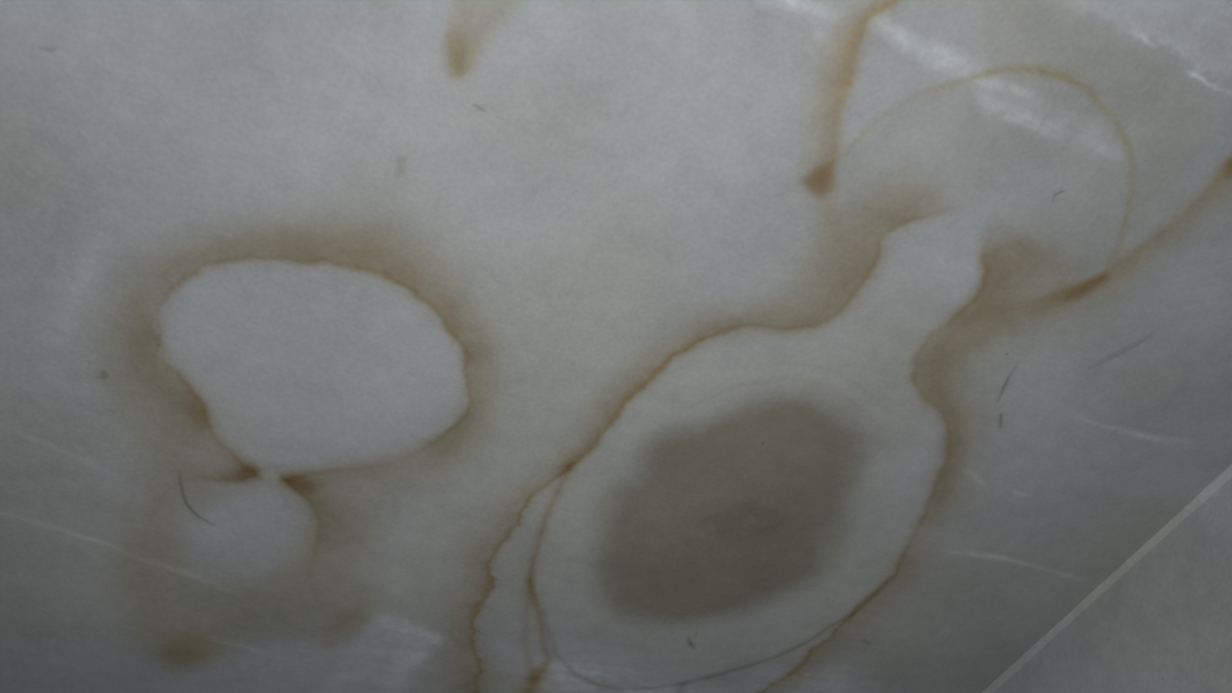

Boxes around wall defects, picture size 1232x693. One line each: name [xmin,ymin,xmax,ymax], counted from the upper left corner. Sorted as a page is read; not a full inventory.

leakage [26,179,519,682]
leakage [413,0,1228,693]